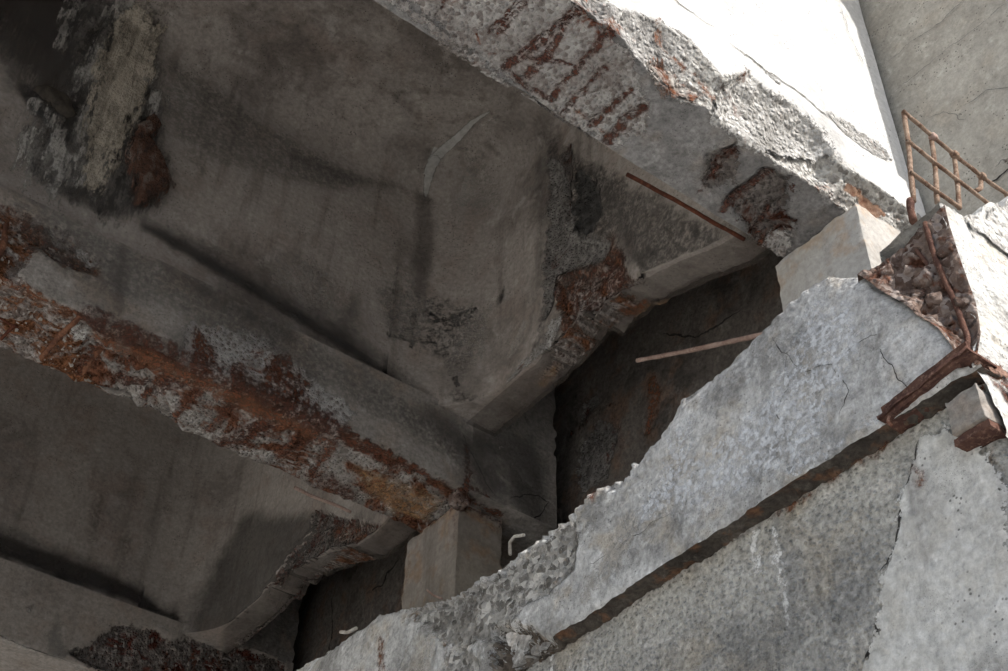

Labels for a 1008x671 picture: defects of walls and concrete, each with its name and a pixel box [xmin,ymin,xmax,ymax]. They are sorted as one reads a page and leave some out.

spalling [387,0,981,384]
rust [906,197,918,225]
water stain [143,225,388,375]
spalling [0,198,454,671]
rust [74,306,503,527]
rust [877,341,1008,452]
spalling [410,521,580,671]